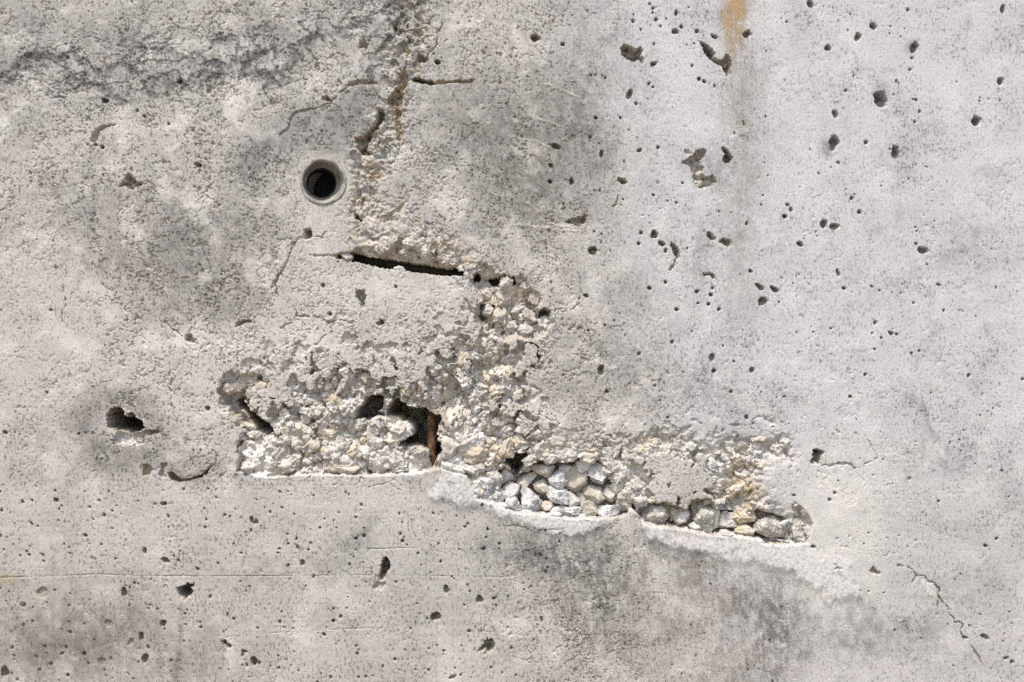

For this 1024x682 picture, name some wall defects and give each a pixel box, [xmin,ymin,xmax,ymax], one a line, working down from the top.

spalling [302,228,326,241]
spalling [332,235,516,286]
spalling [668,240,681,272]
spalling [706,231,732,250]
spalling [355,288,367,311]
spalling [218,370,274,437]
spalling [106,406,160,453]
spalling [354,394,443,468]
spalling [503,452,528,474]
crack [897,564,983,665]